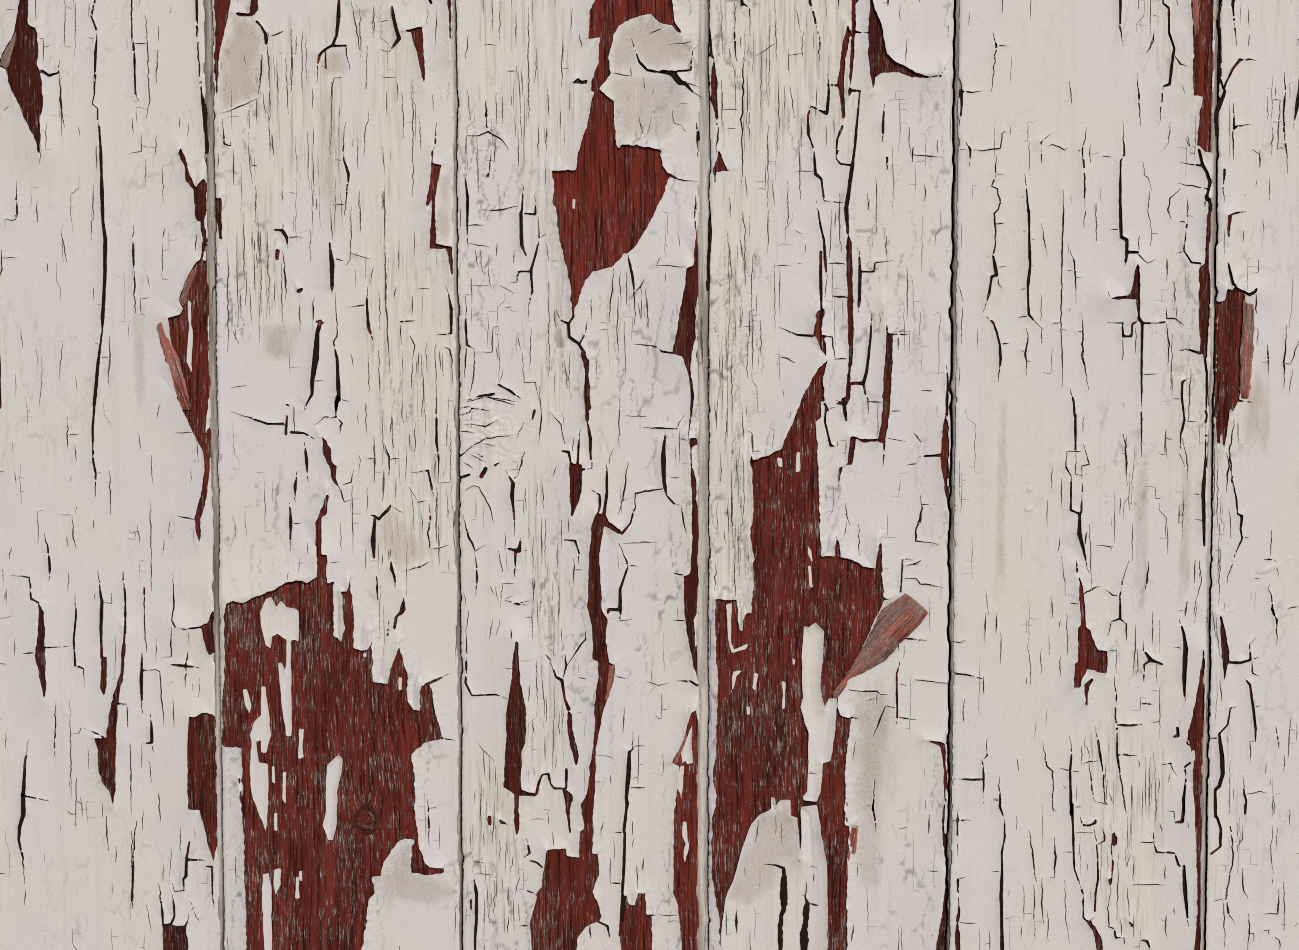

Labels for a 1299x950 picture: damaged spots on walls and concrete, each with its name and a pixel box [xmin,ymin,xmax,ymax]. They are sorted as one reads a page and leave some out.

peeling [0,0,45,153]
peeling [552,0,681,313]
peeling [1191,0,1214,154]
peeling [1212,281,1255,446]
crack [0,0,238,950]
crack [881,0,1299,950]
peeling [187,437,444,950]
peeling [605,665,614,700]
peeling [672,228,928,950]
crack [837,589,1002,757]
peeling [530,823,602,950]
peeling [618,893,652,950]